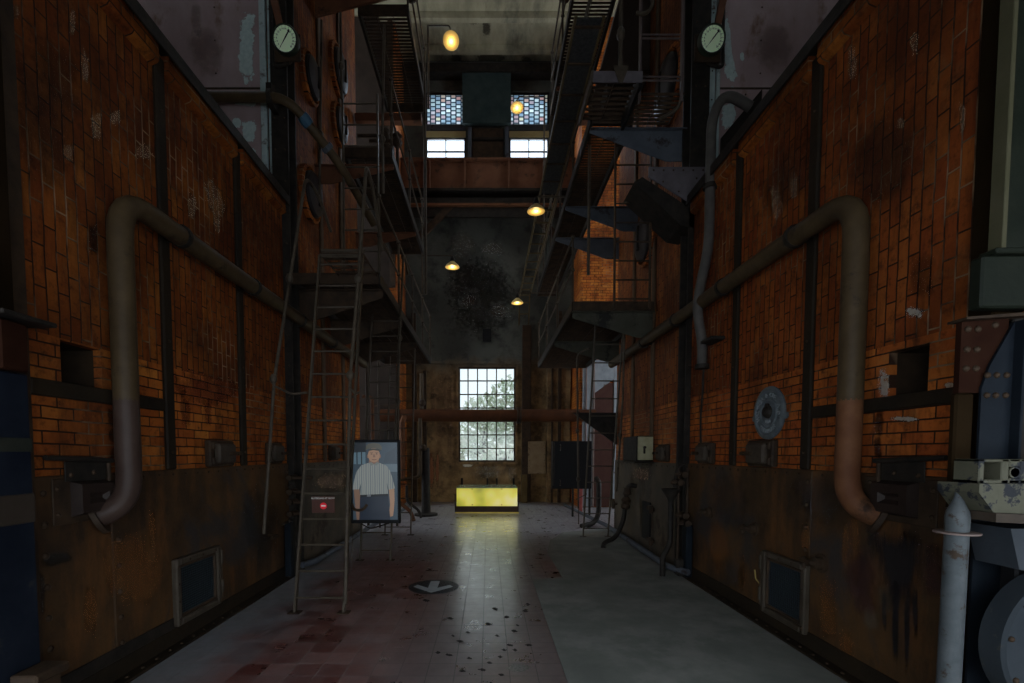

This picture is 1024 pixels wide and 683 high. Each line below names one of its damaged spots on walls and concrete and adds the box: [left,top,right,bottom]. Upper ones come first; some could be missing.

peeling [238,12,256,85]
peeling [232,118,257,153]